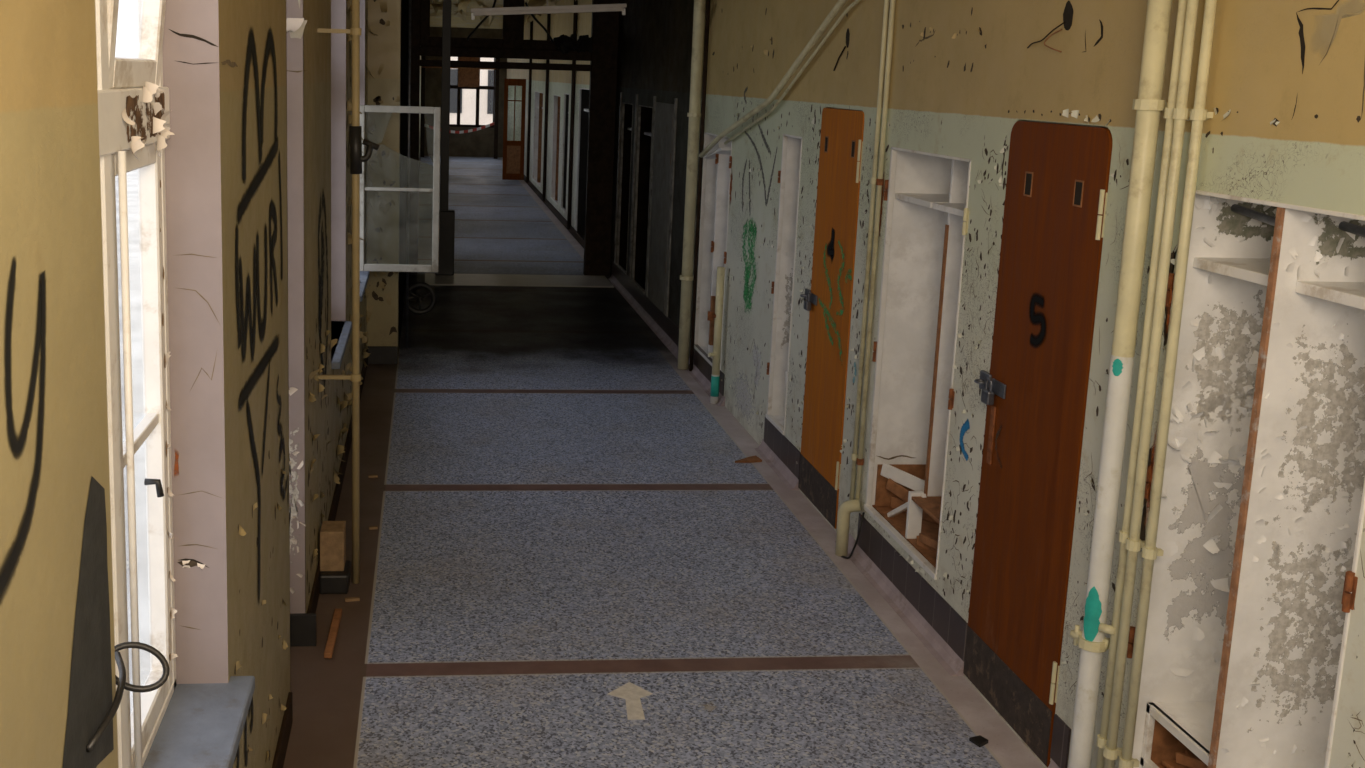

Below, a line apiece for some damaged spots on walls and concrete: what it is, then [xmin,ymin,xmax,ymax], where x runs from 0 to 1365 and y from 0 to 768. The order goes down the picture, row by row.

peeling [721,105,821,449]
peeling [1169,244,1178,273]
peeling [1140,290,1365,754]
crack [1349,712,1365,767]